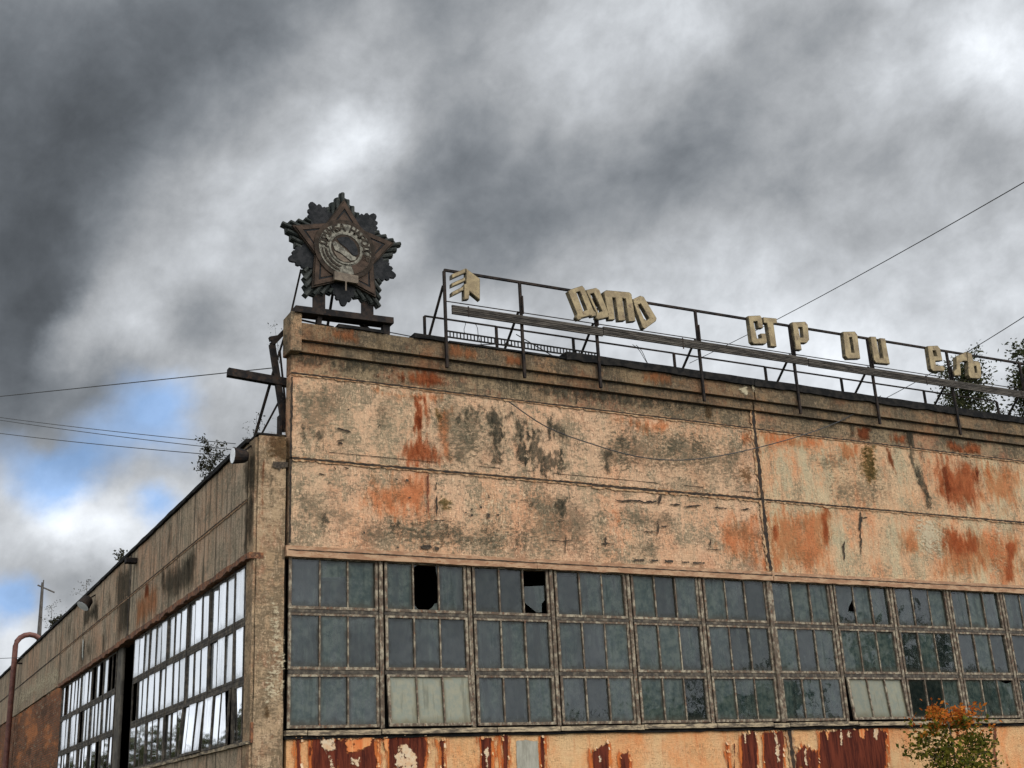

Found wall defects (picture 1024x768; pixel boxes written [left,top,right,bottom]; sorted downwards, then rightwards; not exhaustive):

peeling [291,734,447,768]
peeling [476,735,511,768]
peeling [538,735,549,768]